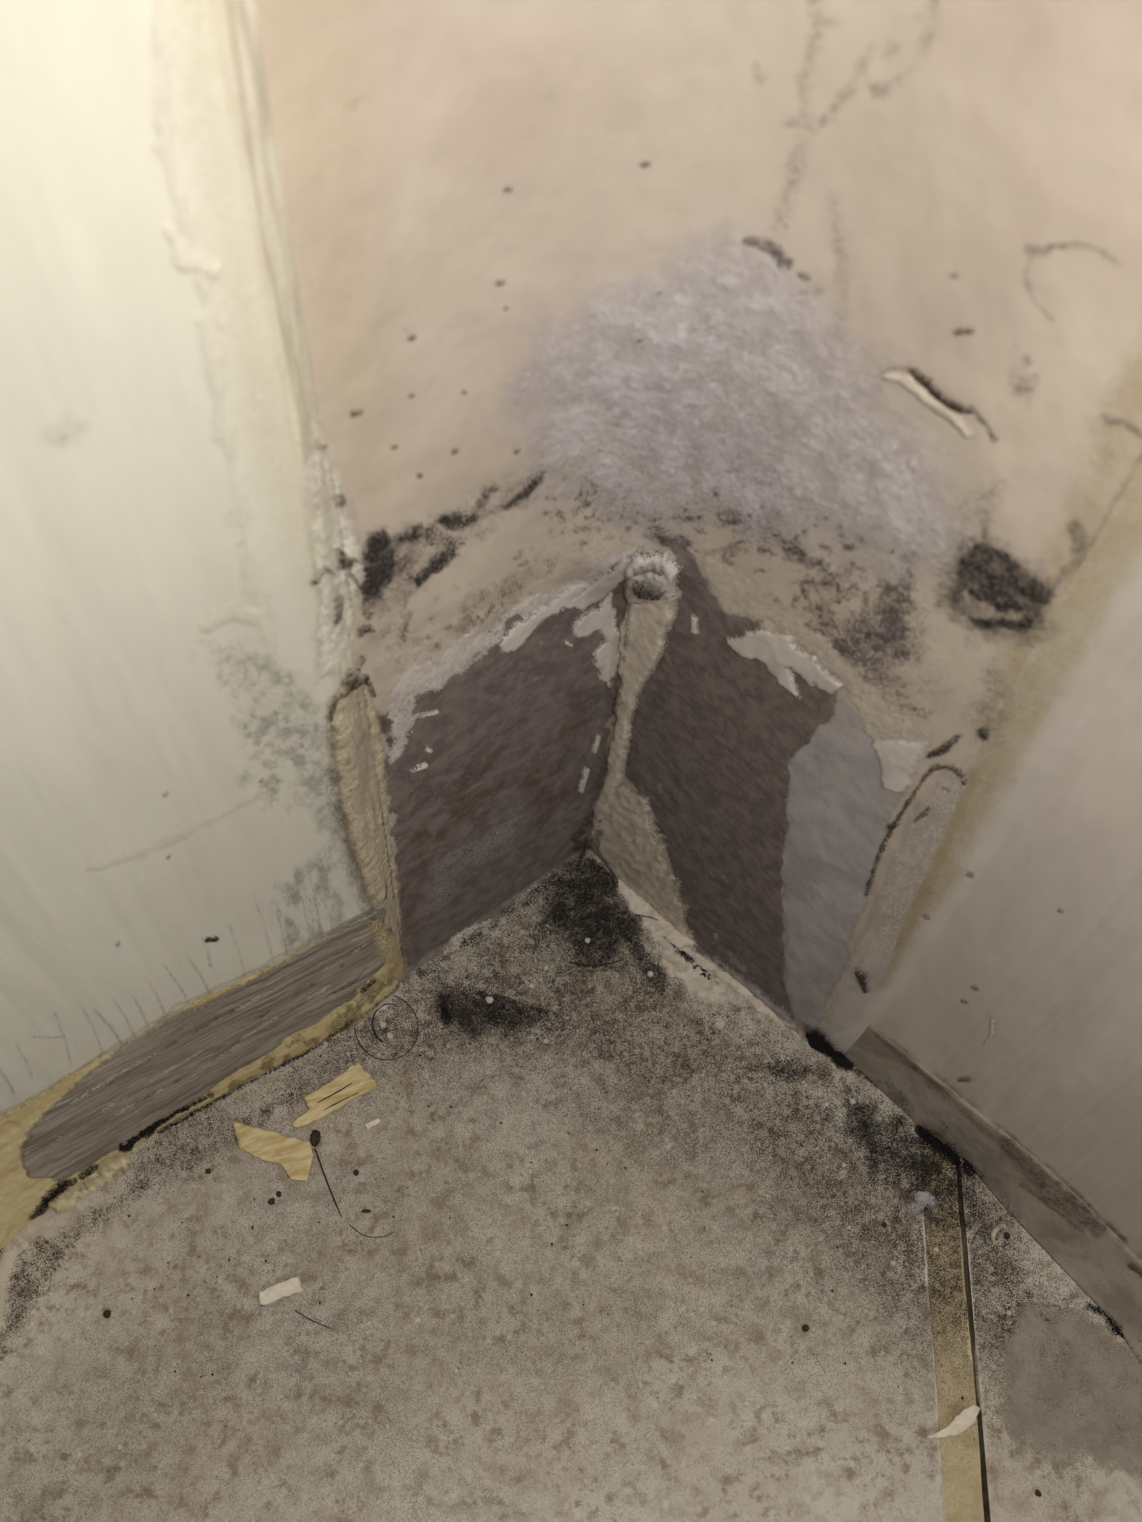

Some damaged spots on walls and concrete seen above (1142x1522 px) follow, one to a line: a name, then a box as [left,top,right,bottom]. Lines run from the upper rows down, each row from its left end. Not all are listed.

damp [740,0,942,347]
damp [353,447,1142,749]
peeling [322,521,936,1049]